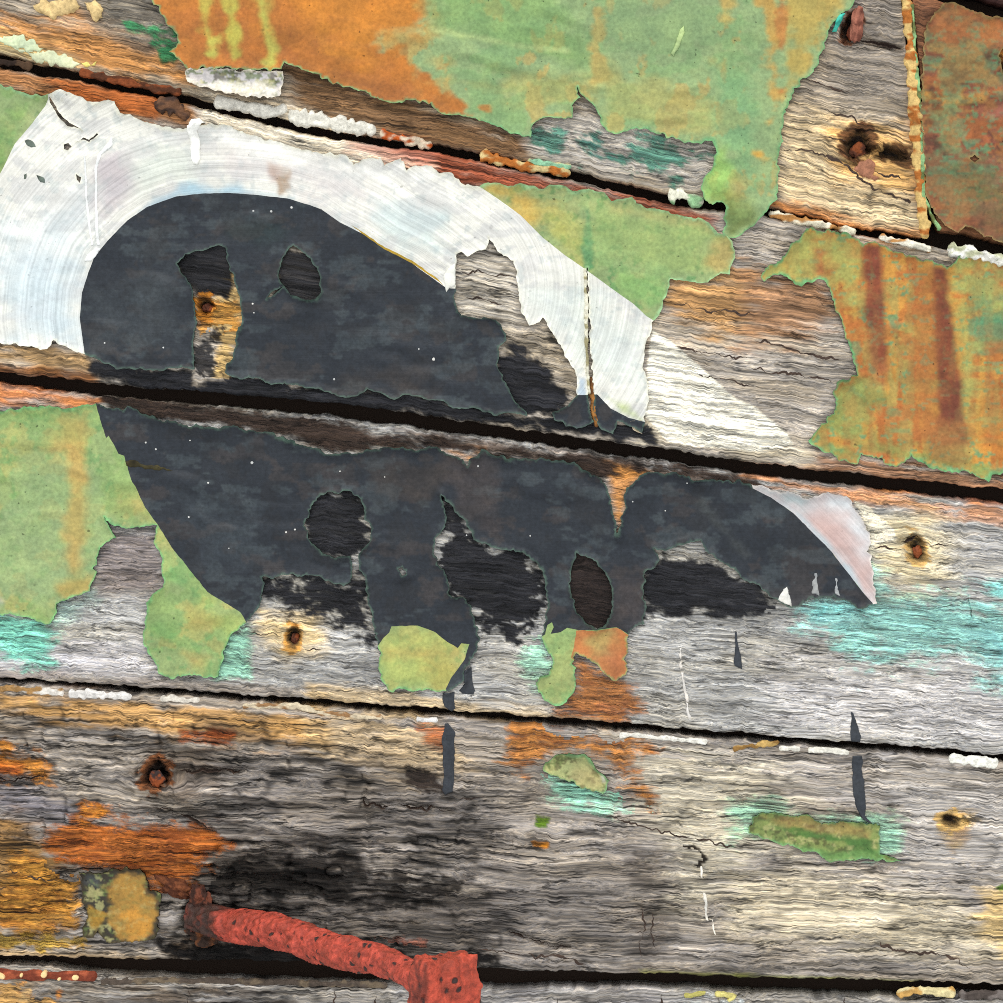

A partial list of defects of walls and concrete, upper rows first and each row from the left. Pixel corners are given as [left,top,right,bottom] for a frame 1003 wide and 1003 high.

peeling [0,0,855,434]
peeling [918,2,1003,243]
peeling [761,227,1003,482]
peeling [0,403,877,706]
peeling [679,648,691,721]